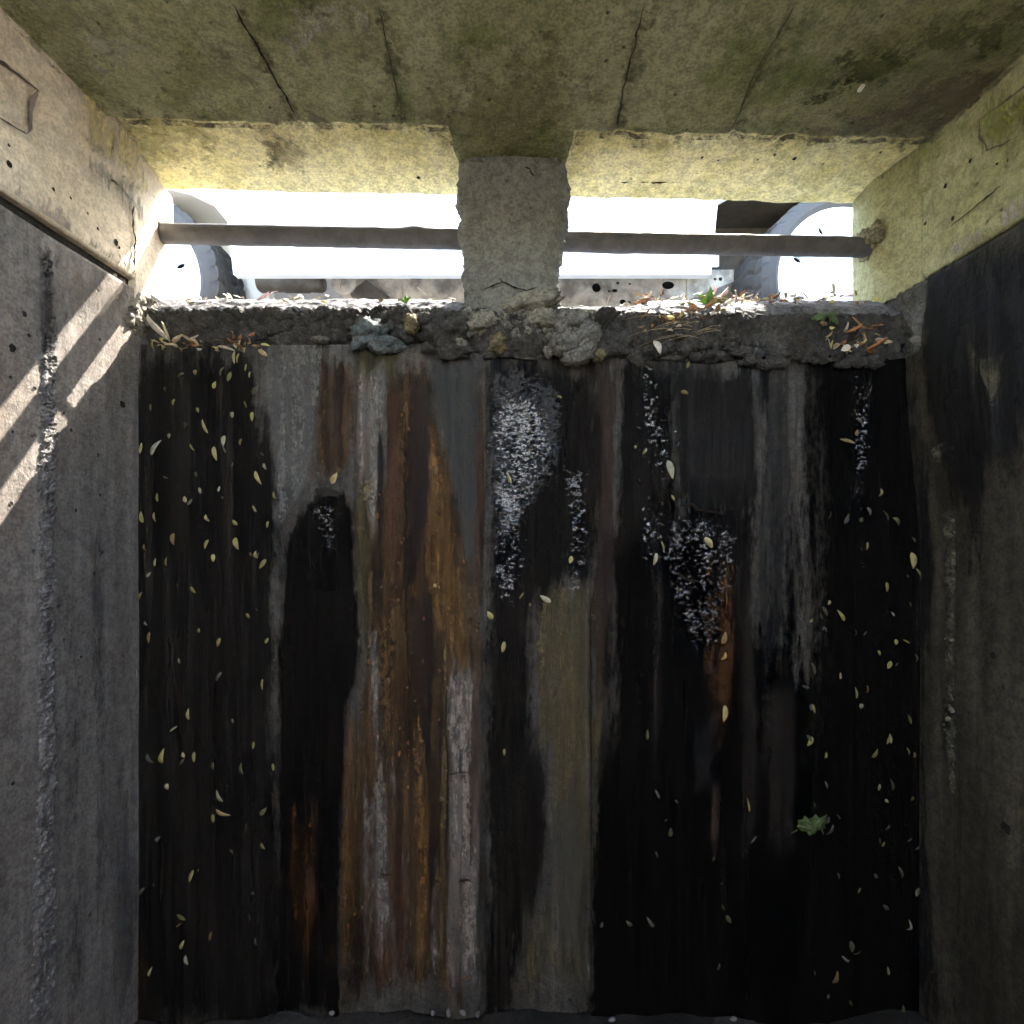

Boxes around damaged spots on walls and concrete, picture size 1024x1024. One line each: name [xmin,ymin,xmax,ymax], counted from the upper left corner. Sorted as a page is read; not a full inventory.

crack [233,5,294,113]
crack [616,6,644,130]
damp [121,343,395,1024]
corrosion [291,795,318,952]
corrosion [332,362,484,1005]
damp [405,233,1024,1024]